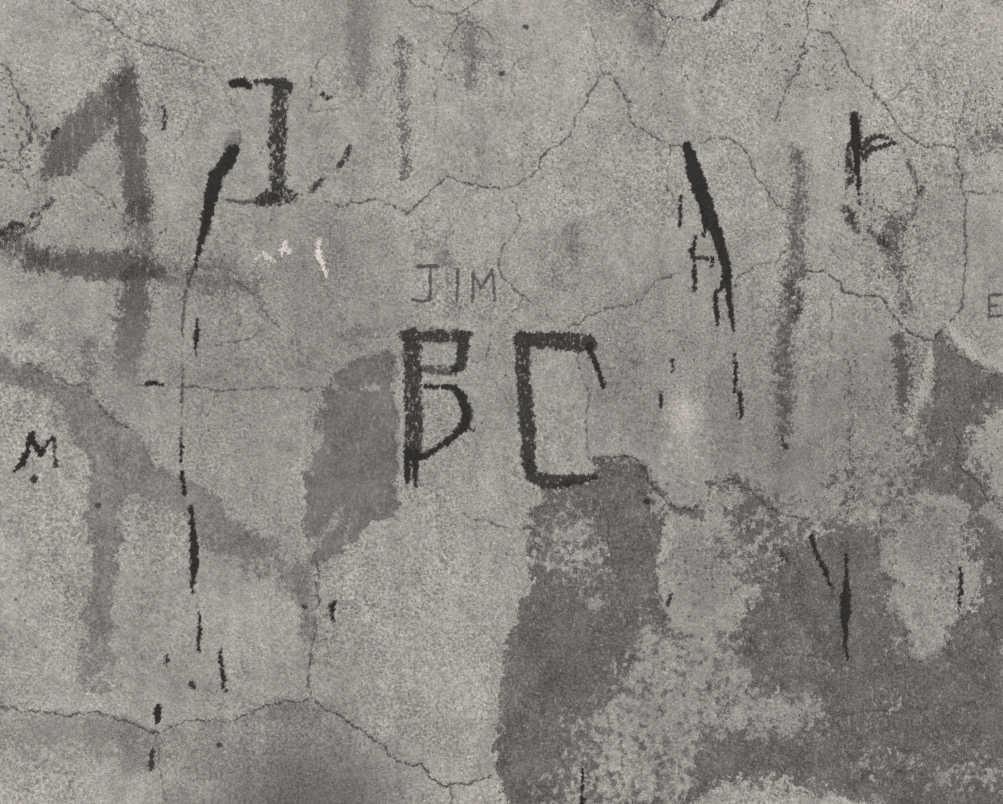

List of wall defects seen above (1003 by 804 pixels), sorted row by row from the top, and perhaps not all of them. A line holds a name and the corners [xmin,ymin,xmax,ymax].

crack [0,63,33,186]
crack [72,2,206,62]
crack [336,72,785,294]
crack [775,1,1002,341]
crack [559,273,673,333]
leakage [0,356,321,694]
crack [577,352,813,524]
peeling [456,322,1003,804]
crack [954,429,1002,513]
crack [0,563,492,798]